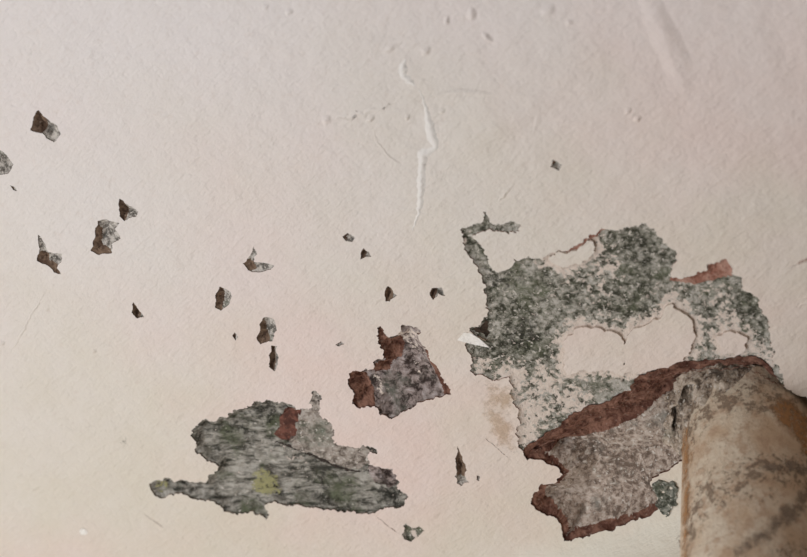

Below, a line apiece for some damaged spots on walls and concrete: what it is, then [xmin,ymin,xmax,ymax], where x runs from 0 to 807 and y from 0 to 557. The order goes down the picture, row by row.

spalling [30,110,60,142]
spalling [0,150,13,175]
spalling [91,199,138,255]
spalling [37,235,62,274]
spalling [215,287,232,310]
spalling [257,317,279,371]
spalling [348,325,451,419]
peeling [455,212,784,541]
flaking render [149,391,408,519]